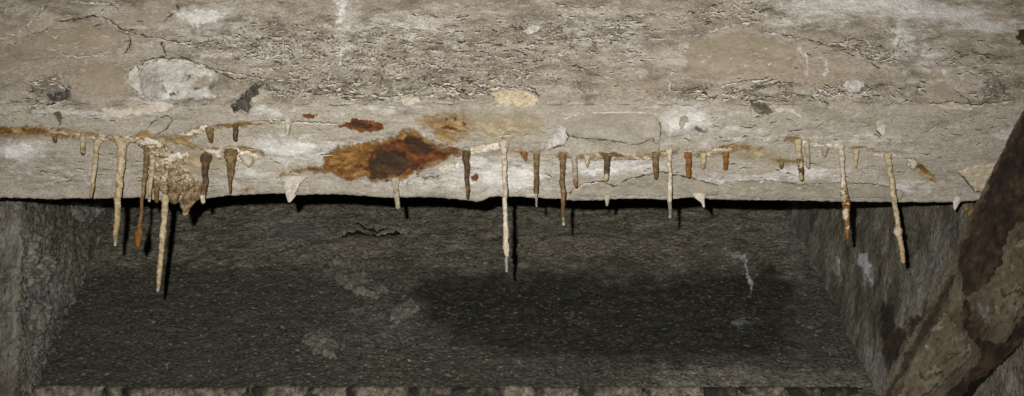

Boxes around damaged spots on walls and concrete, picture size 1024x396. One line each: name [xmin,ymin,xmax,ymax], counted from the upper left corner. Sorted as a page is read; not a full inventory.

crack [0,0,311,84]
spalling [230,84,261,113]
rust [0,125,98,140]
leakage [3,127,317,194]
rust [135,126,219,150]
efflorescence [180,125,208,136]
rust [214,121,273,129]
rust [277,113,469,185]
leakage [452,111,543,190]
efflorescence [554,152,667,177]